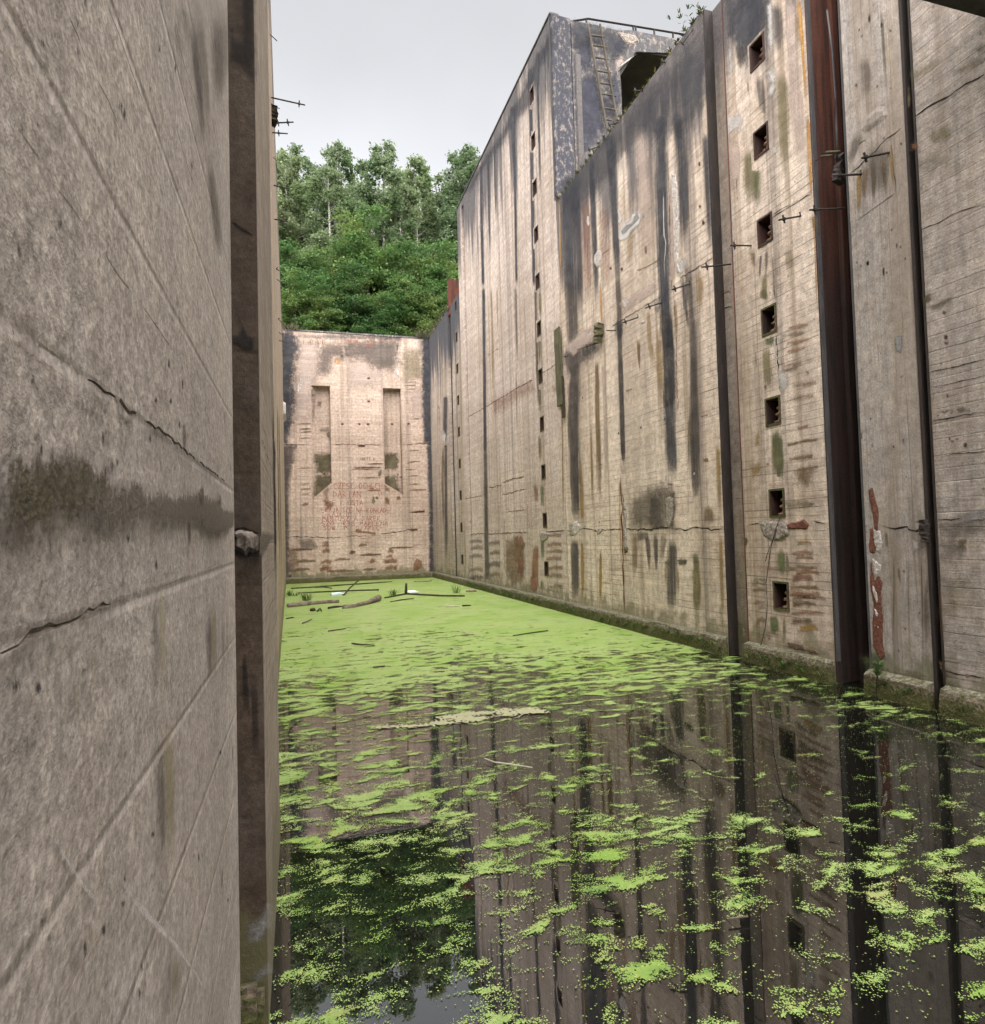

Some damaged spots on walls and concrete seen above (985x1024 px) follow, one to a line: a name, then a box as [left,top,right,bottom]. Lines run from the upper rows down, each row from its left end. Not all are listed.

rust [795,3,806,89]
leakage [703,138,711,234]
leakage [562,50,703,512]
leakage [3,448,234,535]
crack [88,379,225,483]
leakage [259,331,400,578]
rust [506,534,563,592]
leakage [571,542,579,595]
crack [471,479,787,610]
leakage [632,483,679,604]
crack [862,507,975,532]
crack [0,602,110,654]